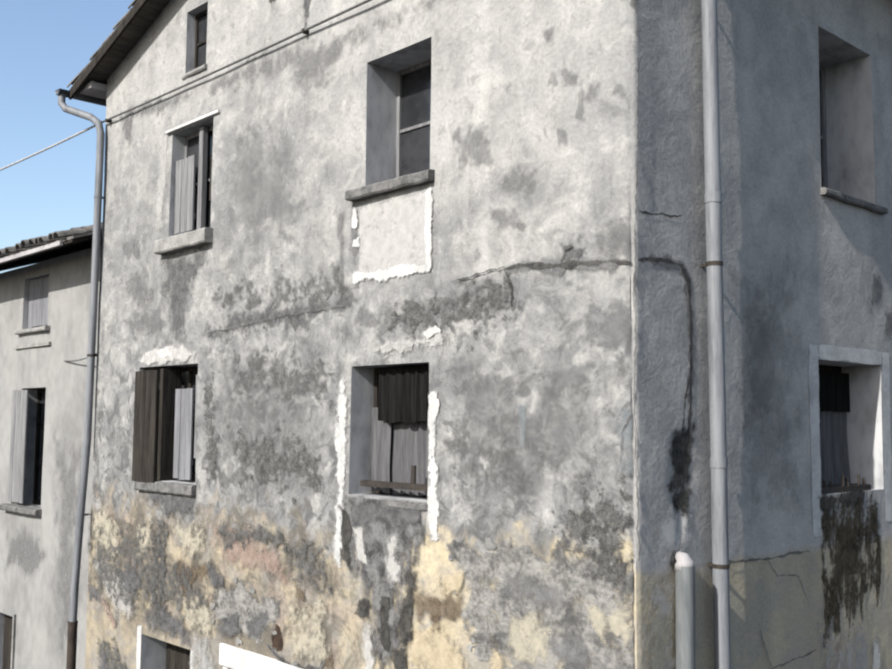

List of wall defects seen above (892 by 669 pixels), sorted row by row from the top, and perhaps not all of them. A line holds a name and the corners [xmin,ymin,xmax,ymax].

flaking render [351,188,433,284]
crack [452,57,695,561]
water stain [147,492,194,615]
water stain [337,497,462,669]
flaking render [408,391,634,669]
crack [729,551,810,598]
mould [819,490,882,648]